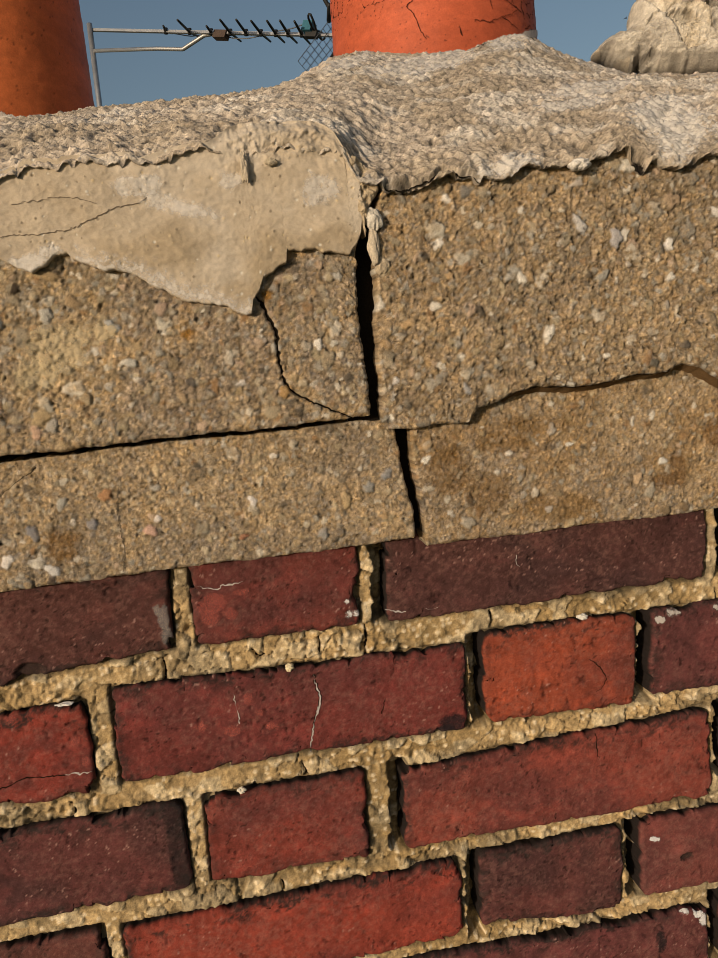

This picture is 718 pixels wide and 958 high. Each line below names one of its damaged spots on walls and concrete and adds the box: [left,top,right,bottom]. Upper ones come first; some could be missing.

crack [459,0,536,36]
flaking render [0,120,362,315]
crack [255,173,480,528]
crack [301,674,322,772]